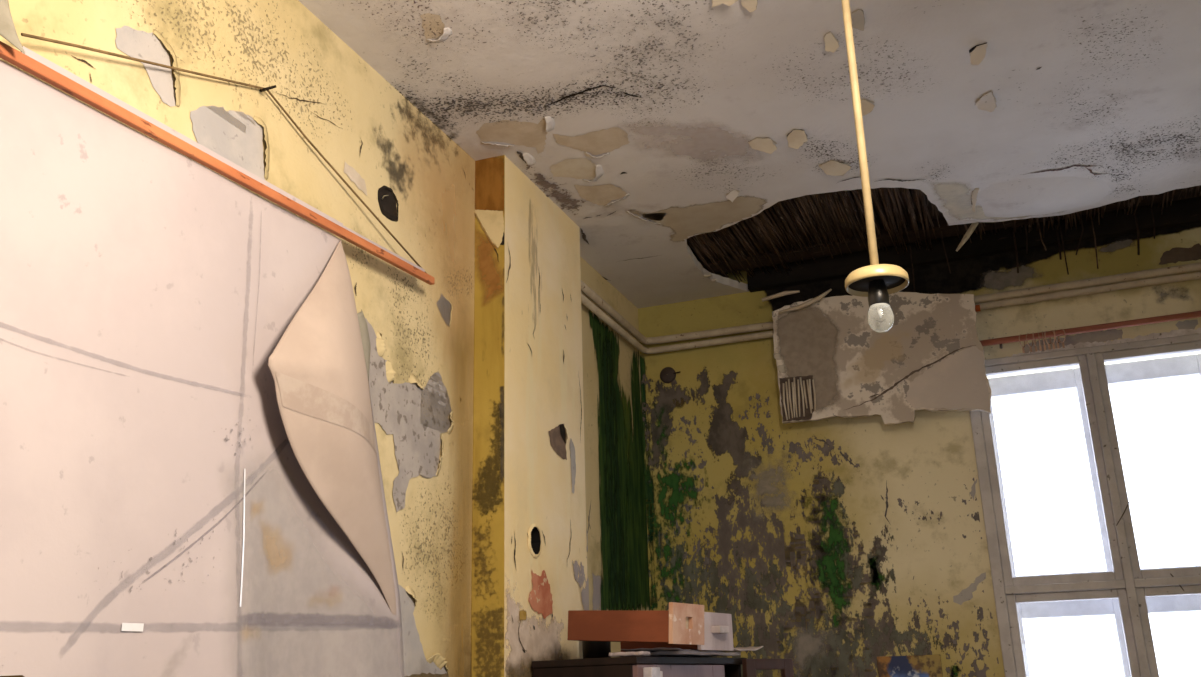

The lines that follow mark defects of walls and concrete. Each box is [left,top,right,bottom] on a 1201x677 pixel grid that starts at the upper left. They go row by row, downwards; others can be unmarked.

damp [773,35,927,101]
peeling [851,9,865,31]
peeling [861,99,875,116]
damp [1038,8,1201,197]
peeling [476,116,665,224]
damp [628,146,766,242]
crack [1023,165,1109,175]
peeling [365,318,454,512]
crack [846,345,975,410]
damp [453,386,504,677]
peeling [641,367,999,677]
spalling [505,570,563,674]